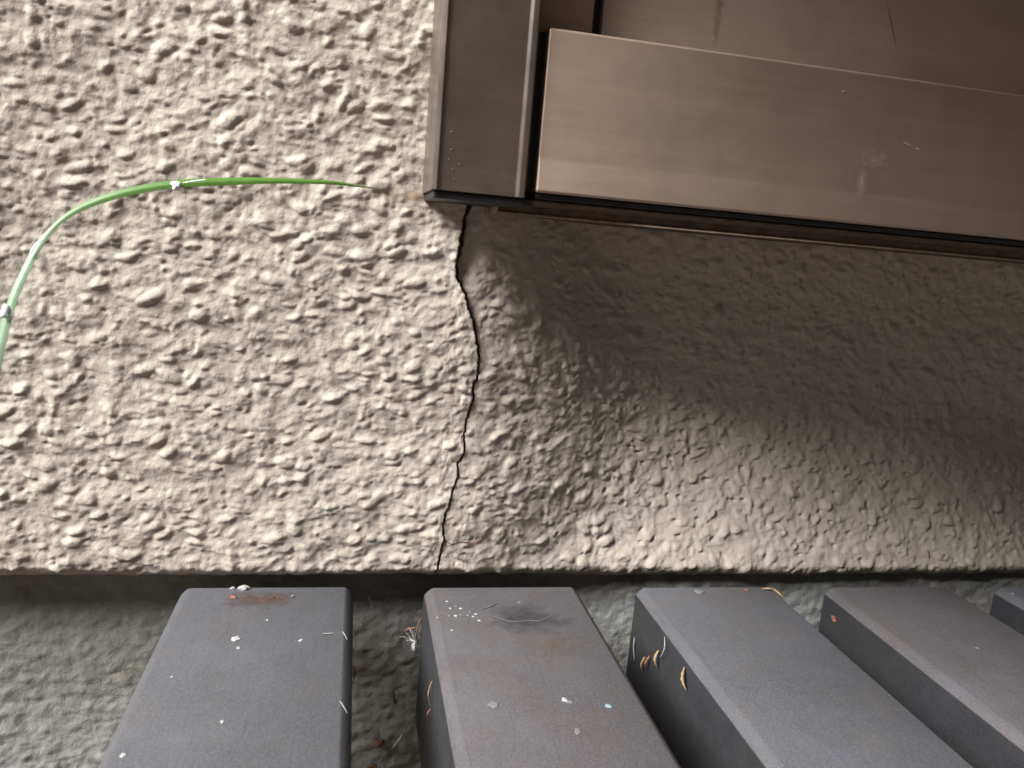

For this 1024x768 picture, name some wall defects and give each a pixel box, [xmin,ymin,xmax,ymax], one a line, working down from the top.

crack [435,205,480,573]